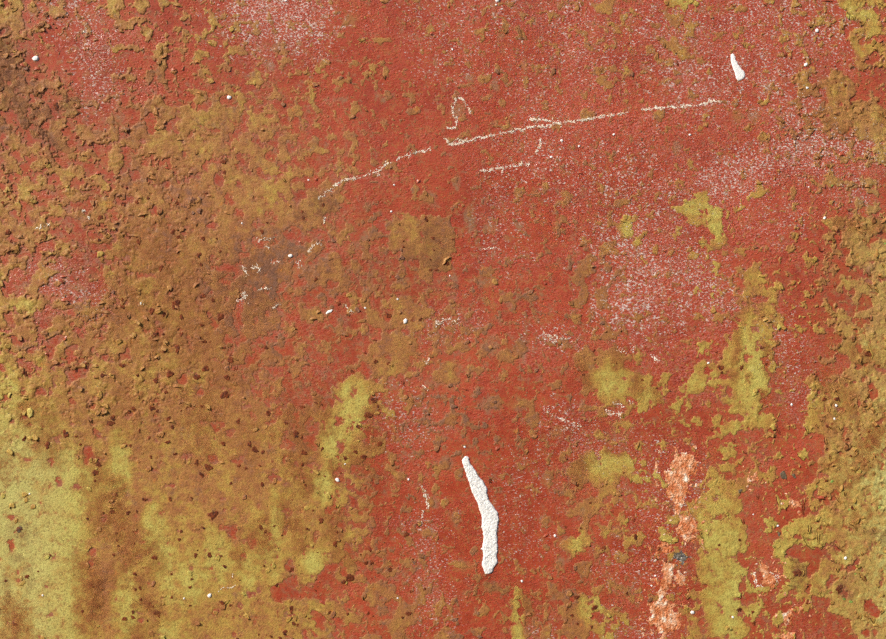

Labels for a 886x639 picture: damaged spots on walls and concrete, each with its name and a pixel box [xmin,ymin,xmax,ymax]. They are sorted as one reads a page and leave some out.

peeling [0,0,548,639]